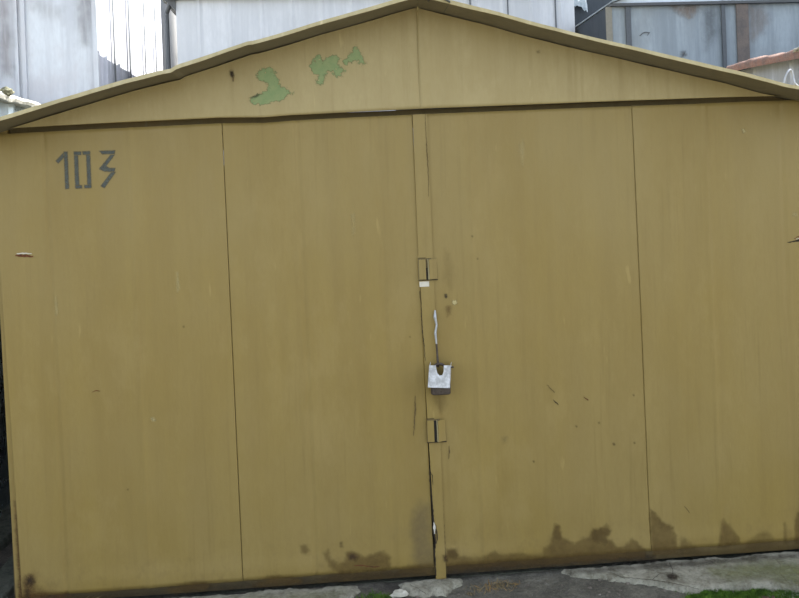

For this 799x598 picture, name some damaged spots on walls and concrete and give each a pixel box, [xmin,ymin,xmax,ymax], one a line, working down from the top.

peeling [309,47,365,85]
peeling [250,67,293,106]